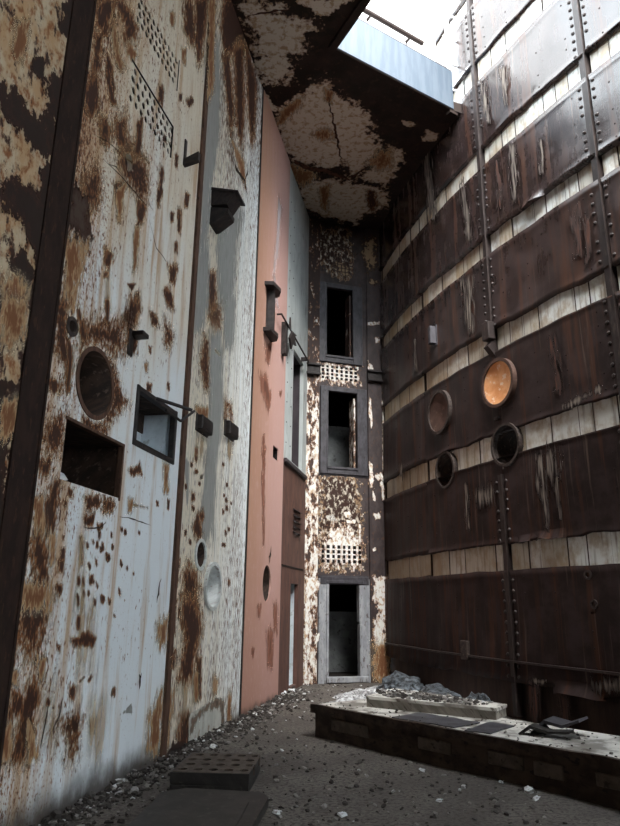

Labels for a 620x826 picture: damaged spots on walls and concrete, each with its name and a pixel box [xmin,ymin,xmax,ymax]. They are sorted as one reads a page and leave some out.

rust [170,0,258,190]
peeling [237,0,406,286]
crack [294,97,368,181]
peeling [401,120,440,142]
rust [49,0,178,435]
rust [170,192,189,254]
rust [569,200,594,265]
peeling [319,360,374,388]
peeling [367,398,385,501]
rust [2,410,73,766]
rust [146,558,204,764]
rust [52,675,97,771]